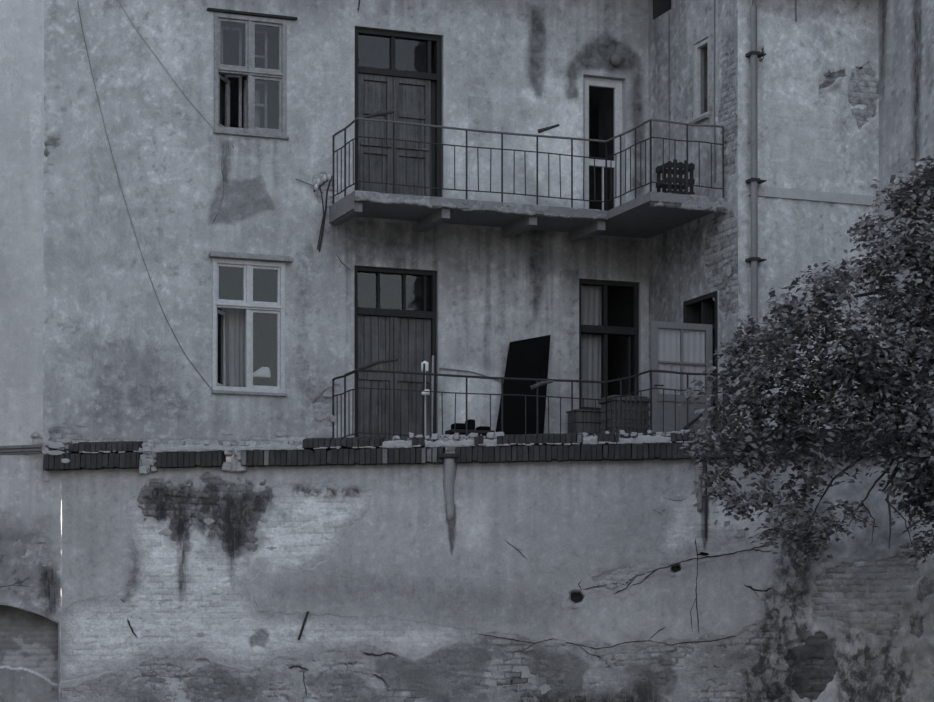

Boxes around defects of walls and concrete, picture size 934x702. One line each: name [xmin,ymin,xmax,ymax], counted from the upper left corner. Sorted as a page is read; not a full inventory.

spalling [819,62,879,130]
damp [148,486,268,542]
spalling [61,472,839,702]
crack [475,539,775,658]